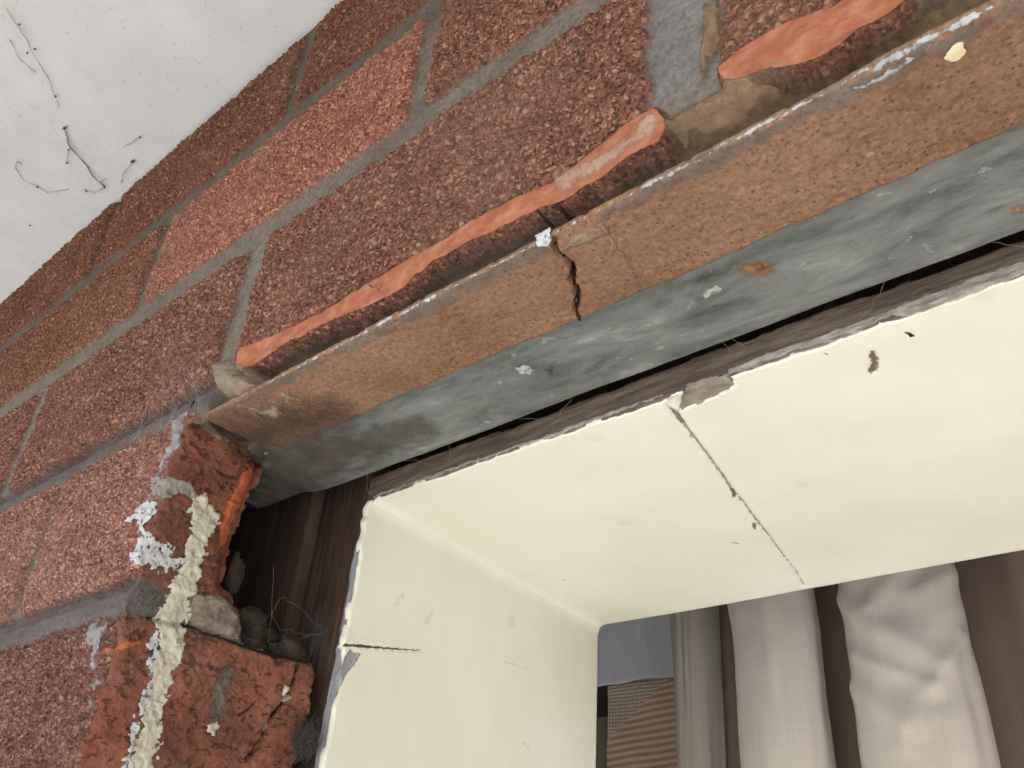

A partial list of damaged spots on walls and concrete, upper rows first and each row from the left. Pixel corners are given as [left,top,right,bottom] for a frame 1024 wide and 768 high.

crack [536,202,581,321]
peeling [667,262,1024,412]
spalling [219,467,253,548]
crack [670,408,804,585]
crack [343,643,420,651]